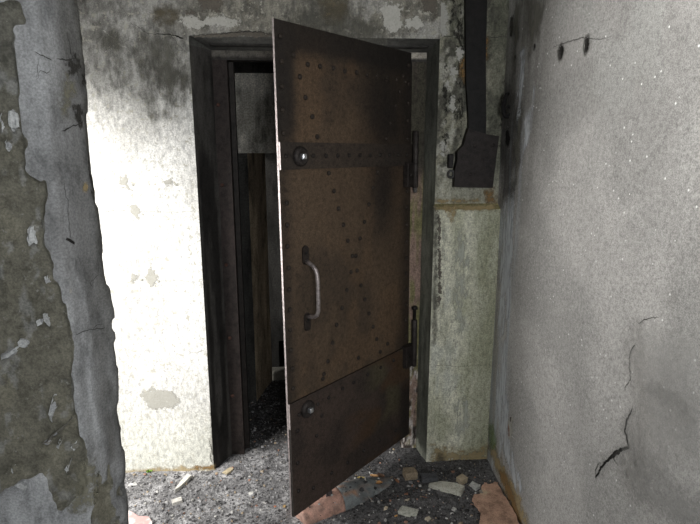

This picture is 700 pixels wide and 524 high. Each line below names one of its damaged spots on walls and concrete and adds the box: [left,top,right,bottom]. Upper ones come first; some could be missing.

leakage [154,5,178,24]
leakage [289,0,383,41]
peeling [379,0,449,39]
leakage [101,30,121,80]
leakage [142,36,189,100]
spalling [441,47,465,113]
flaking render [0,0,88,511]
crack [595,407,633,478]